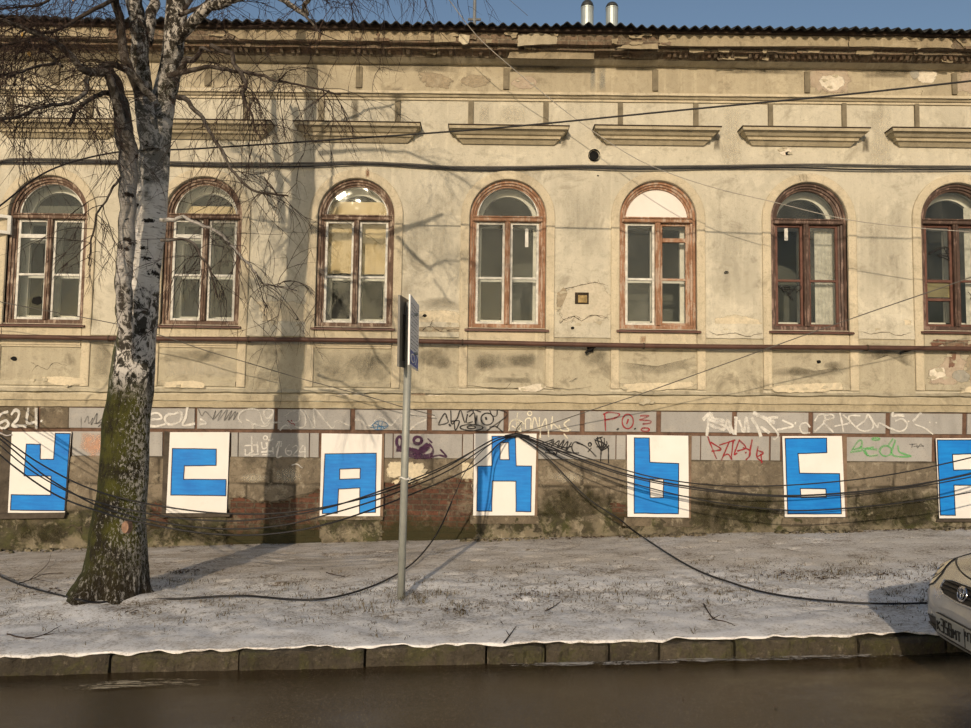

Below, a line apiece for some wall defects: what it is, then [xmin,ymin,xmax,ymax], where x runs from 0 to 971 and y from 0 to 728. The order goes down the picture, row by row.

peeling [810,69,852,93]
crack [559,313,608,323]
spalling [927,339,971,394]
spalling [222,489,321,544]
spalling [380,462,477,541]